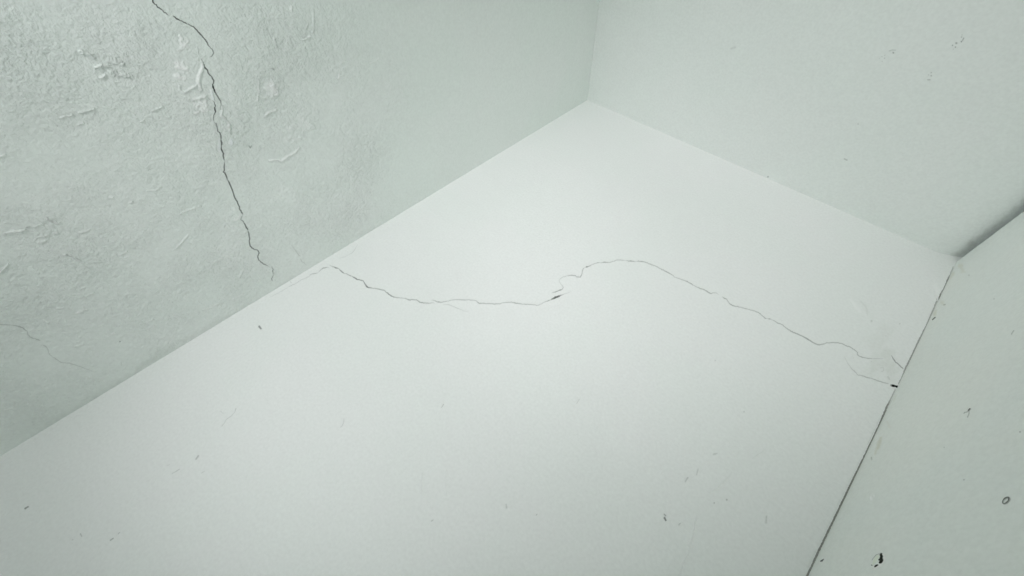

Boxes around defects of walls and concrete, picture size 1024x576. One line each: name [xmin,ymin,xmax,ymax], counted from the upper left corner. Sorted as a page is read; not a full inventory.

crack [151,0,954,576]